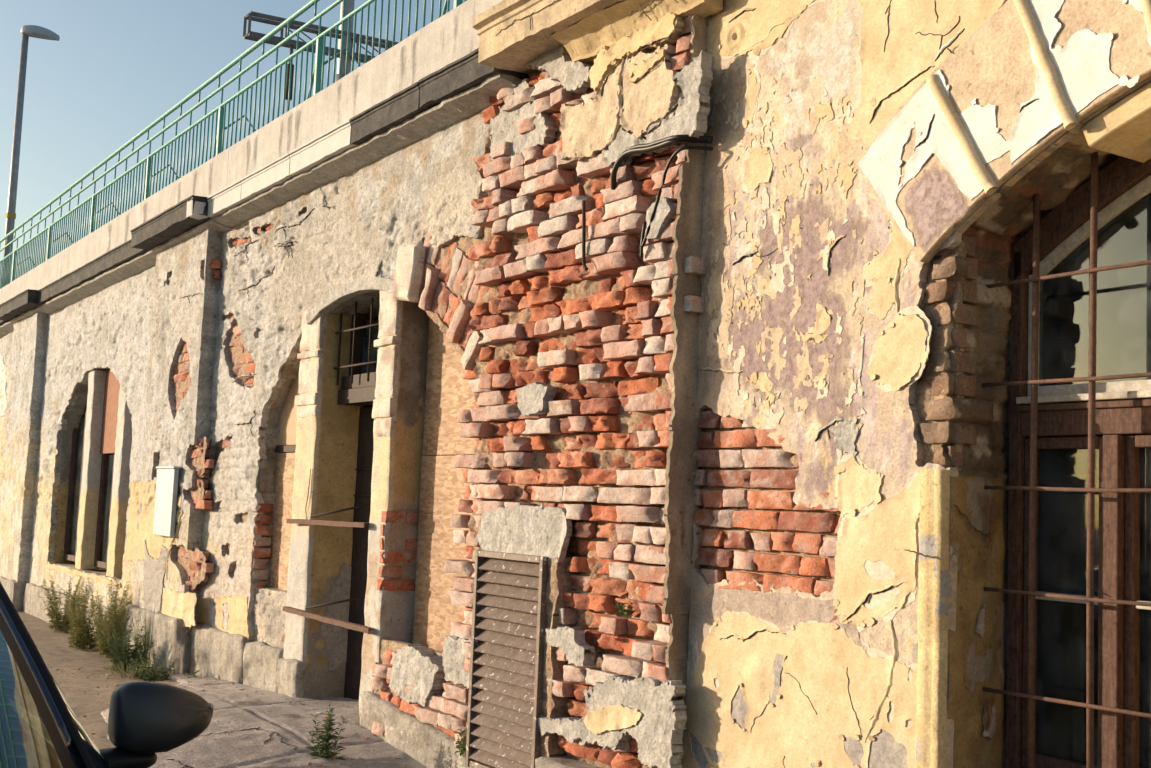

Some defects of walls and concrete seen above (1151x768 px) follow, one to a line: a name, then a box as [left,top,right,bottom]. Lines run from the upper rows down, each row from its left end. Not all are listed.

crack [496,0,559,36]
peeling [1122,0,1151,46]
crack [869,1,965,124]
crack [234,187,334,297]
flaking render [173,341,191,411]
flaking render [224,314,256,388]
flaking render [371,0,1140,768]
peeling [125,437,274,642]
crack [905,549,943,562]
crack [843,581,908,622]
crack [846,620,898,743]